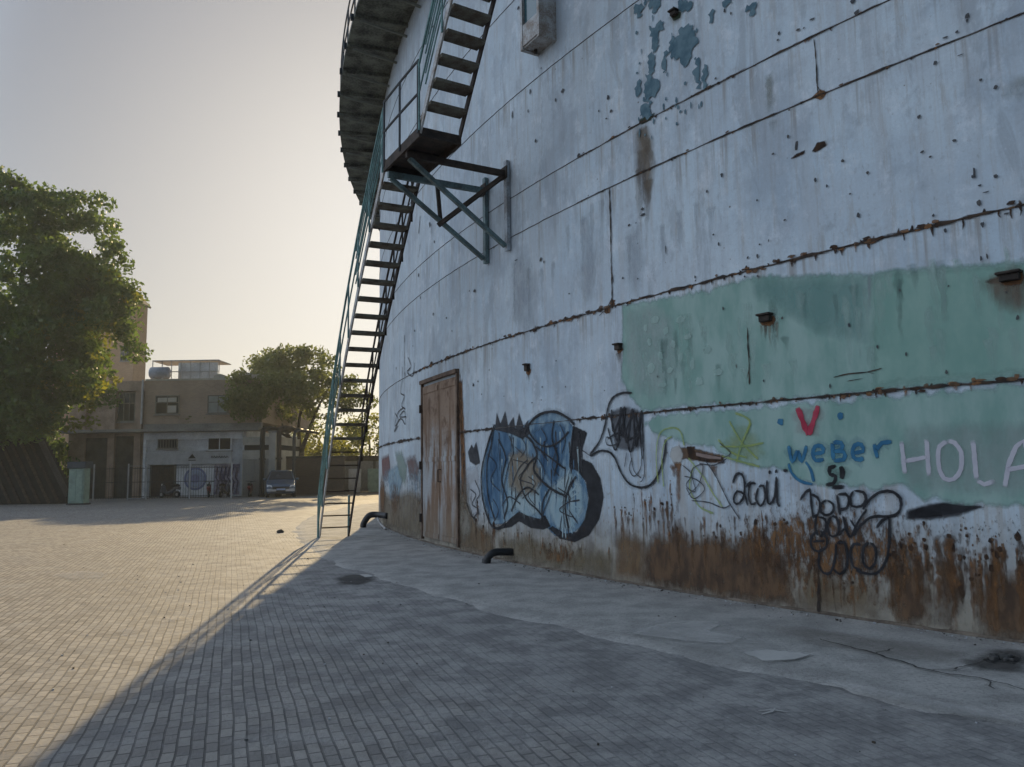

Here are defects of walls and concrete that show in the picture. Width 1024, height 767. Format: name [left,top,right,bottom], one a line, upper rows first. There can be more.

peeling [708,0,732,23]
peeling [634,0,717,139]
leakage [636,113,654,193]
rust [412,200,1024,374]
rust [380,470,421,535]
spalling [670,446,724,498]
rust [459,374,1024,640]
crack [821,639,1022,689]